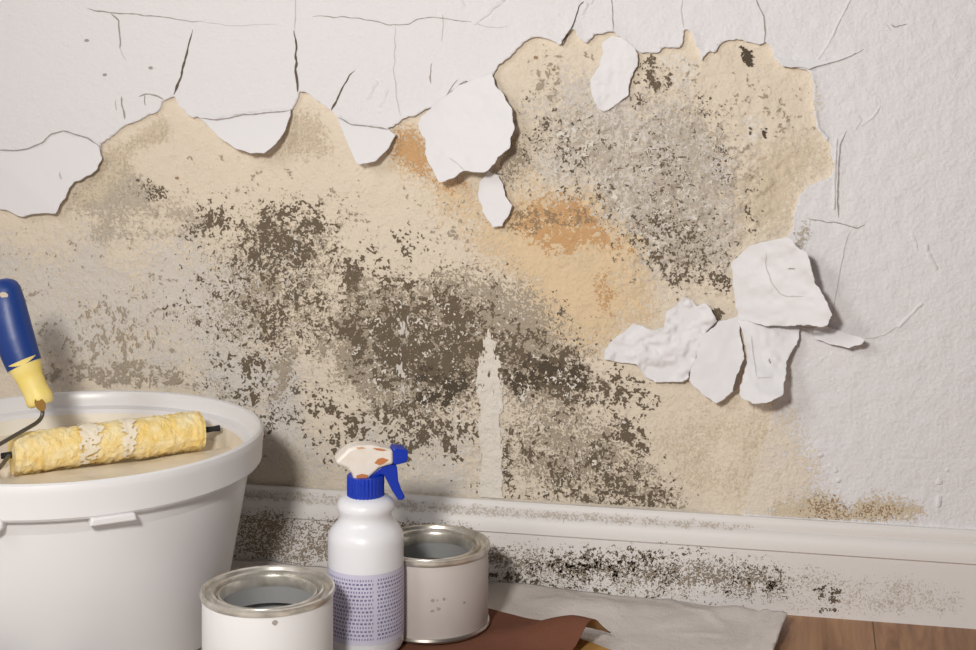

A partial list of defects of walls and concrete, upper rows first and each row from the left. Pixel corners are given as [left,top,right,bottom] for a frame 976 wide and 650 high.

crack [561,1,584,45]
crack [756,0,766,42]
crack [87,0,508,130]
crack [0,130,99,151]
crack [796,116,864,329]
flaking render [0,29,865,515]
water stain [42,54,930,523]
crack [765,255,804,297]
mould [488,536,843,614]